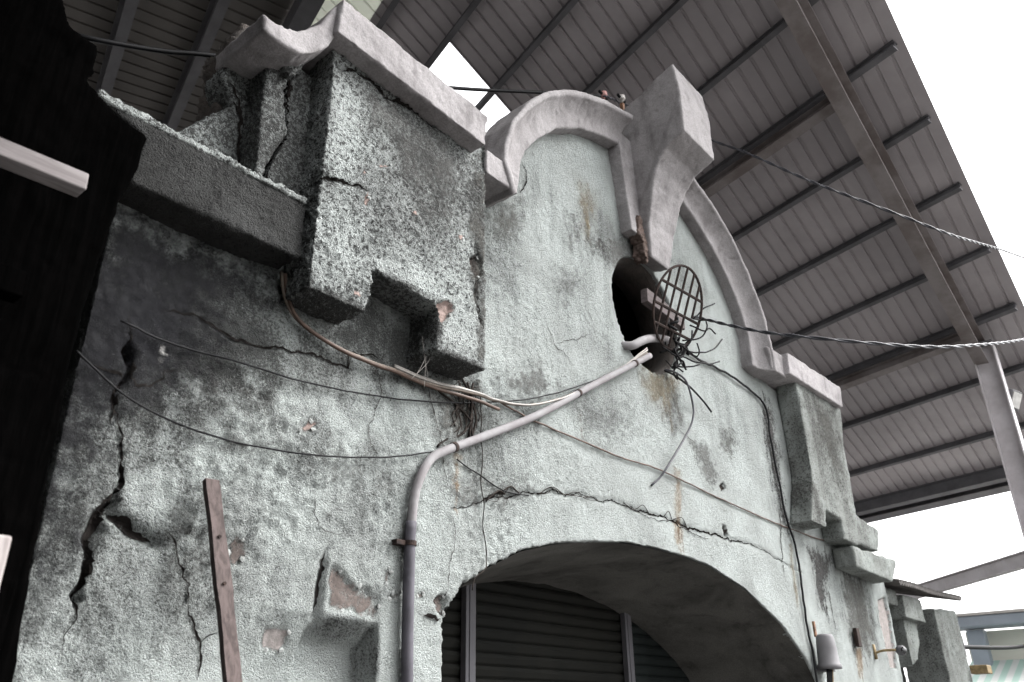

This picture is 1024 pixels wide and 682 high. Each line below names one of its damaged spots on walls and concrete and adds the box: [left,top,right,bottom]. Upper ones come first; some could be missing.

crack [263,79,293,178]
crack [299,176,373,193]
spalling [436,298,453,323]
crack [170,309,382,454]
crack [61,317,215,680]
crack [423,389,804,621]
water stain [692,443,717,485]
spalling [329,566,402,616]
spalling [415,591,445,617]
water stain [806,545,874,666]